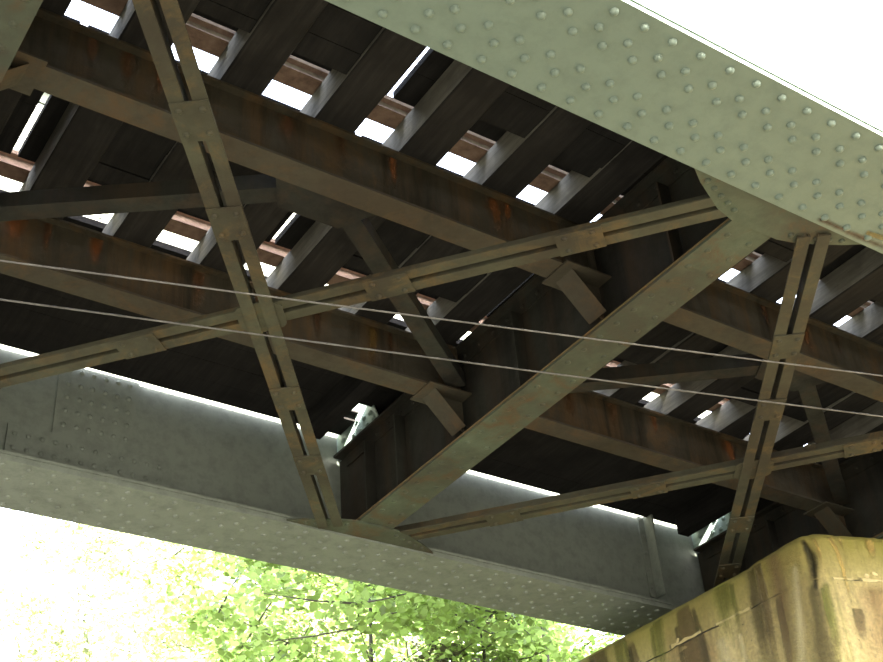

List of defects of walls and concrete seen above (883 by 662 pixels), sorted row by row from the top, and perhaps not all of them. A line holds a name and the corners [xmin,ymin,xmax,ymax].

leakage [623,638,639,662]
leakage [677,607,709,662]
leakage [755,564,791,662]